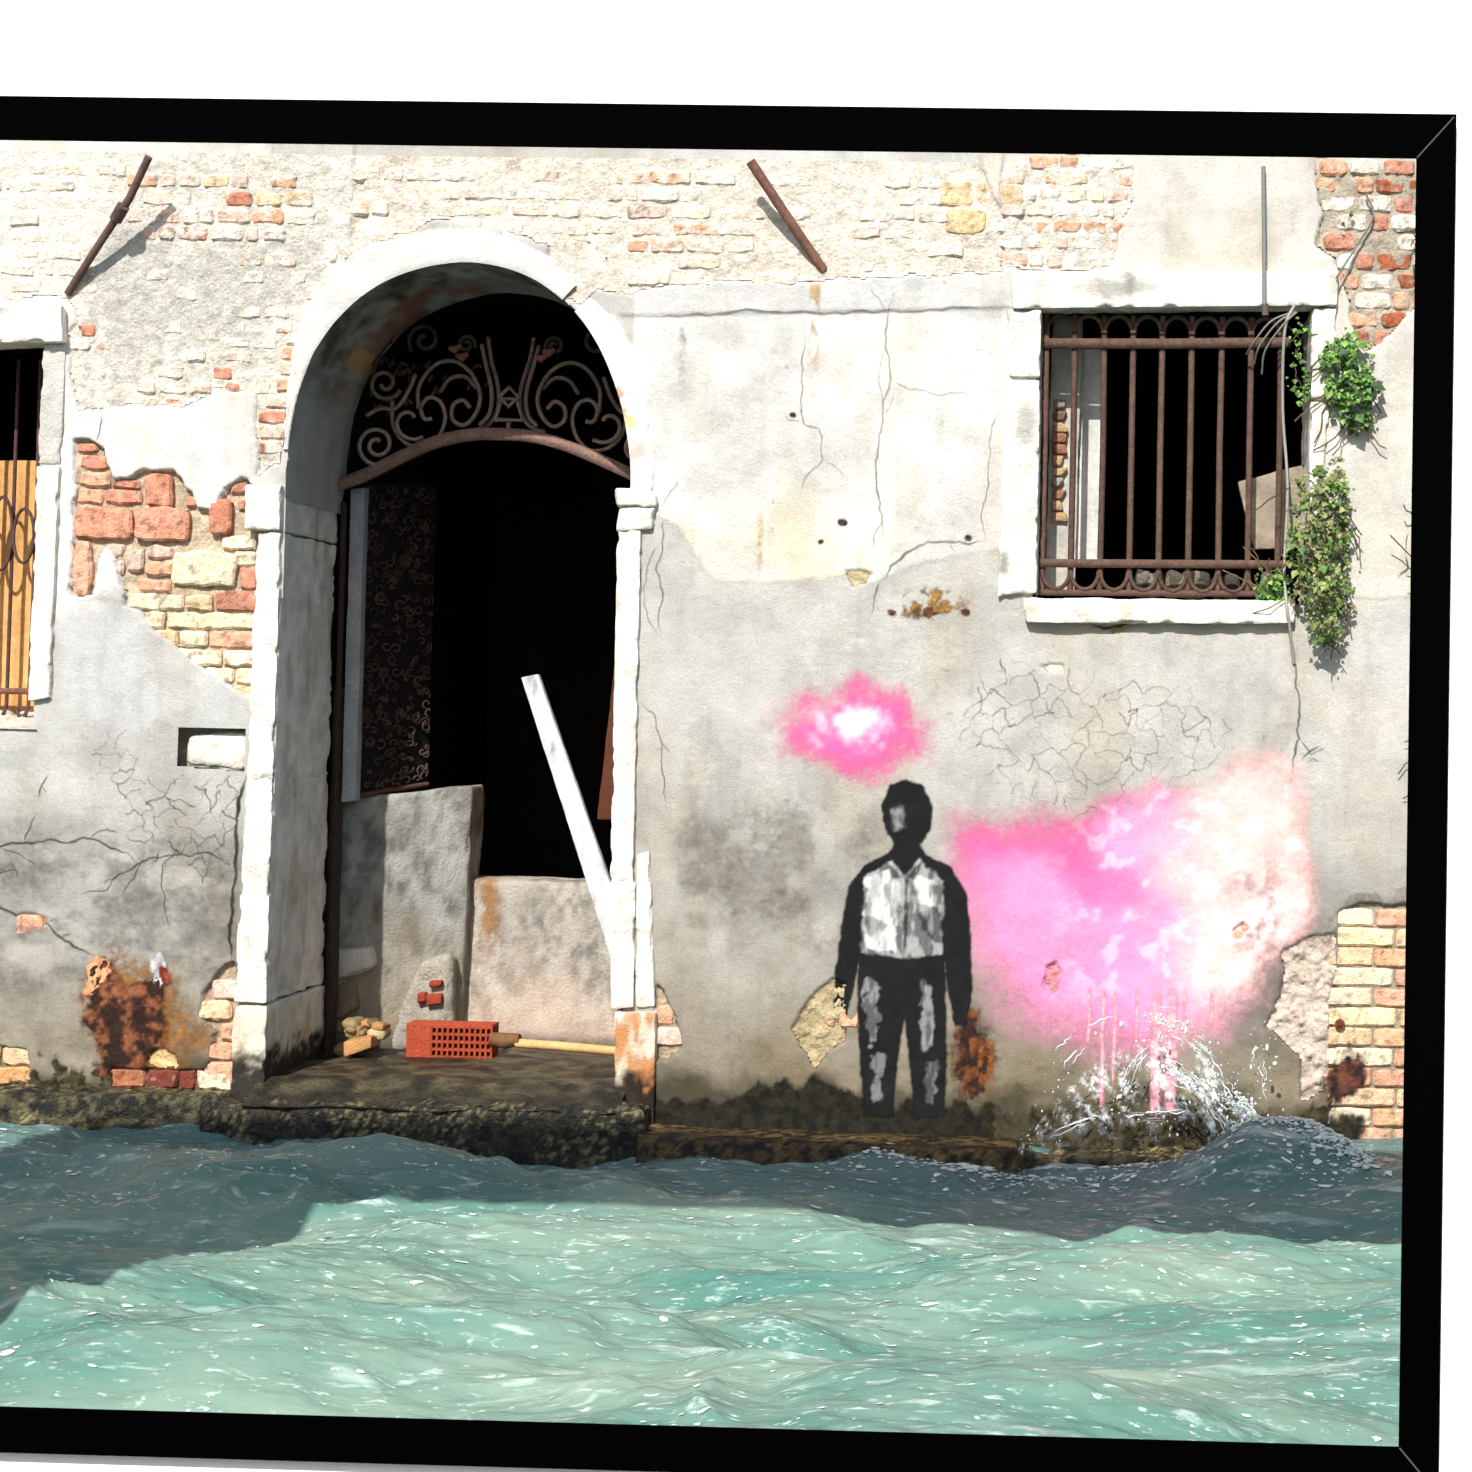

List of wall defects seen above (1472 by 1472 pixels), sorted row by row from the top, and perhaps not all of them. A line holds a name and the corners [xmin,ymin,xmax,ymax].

peeling [1315,157,1416,351]
peeling [0,150,1133,697]
crack [889,541,971,570]
crack [0,778,244,952]
flaking render [0,1046,31,1084]
rust [80,956,213,1078]
rust [951,1007,996,1099]
flaking render [1267,904,1406,1139]